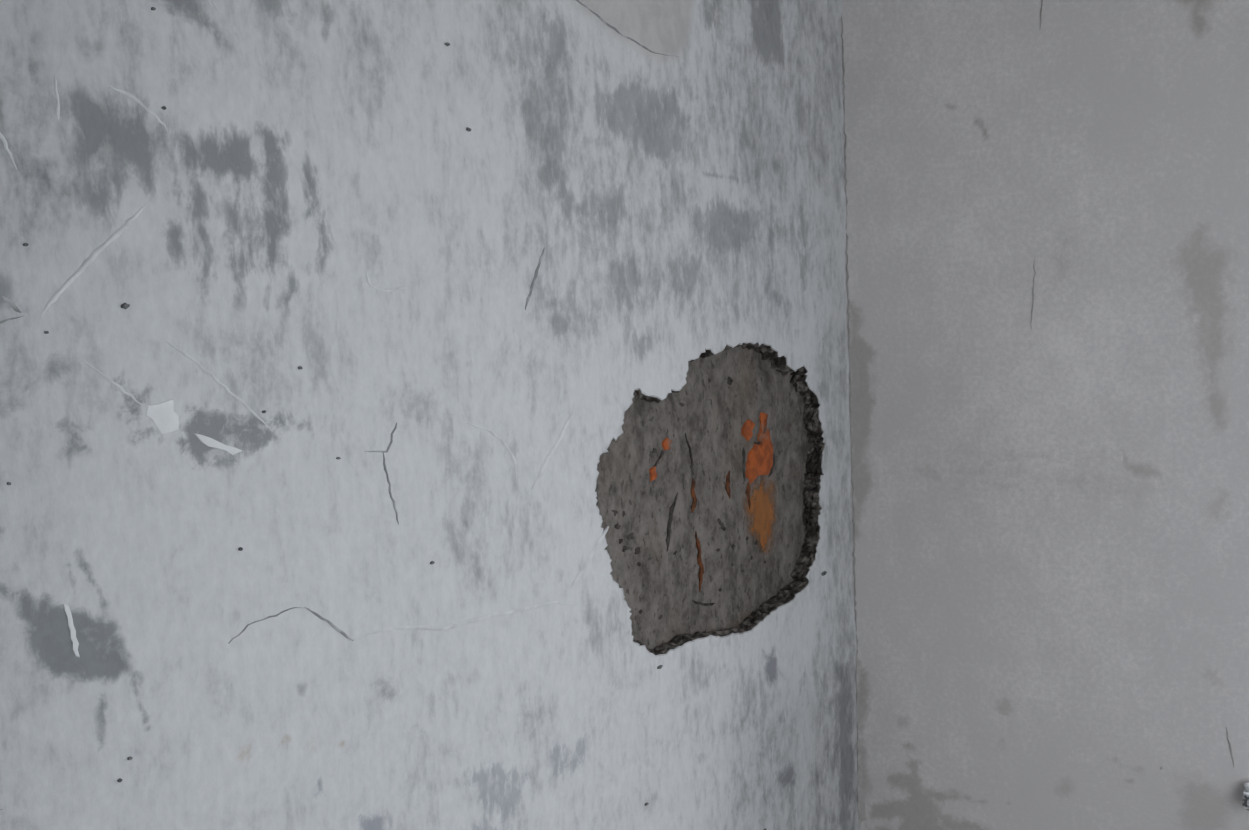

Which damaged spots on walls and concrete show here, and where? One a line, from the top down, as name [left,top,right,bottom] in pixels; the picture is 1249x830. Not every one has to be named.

peeling [94,0,351,70]
crack [576,0,678,57]
leakage [1141,0,1247,56]
peeling [37,55,349,335]
peeling [523,0,825,702]
crack [365,423,399,524]
crack [228,607,354,644]
leakage [822,639,1023,830]
peeling [770,749,802,810]